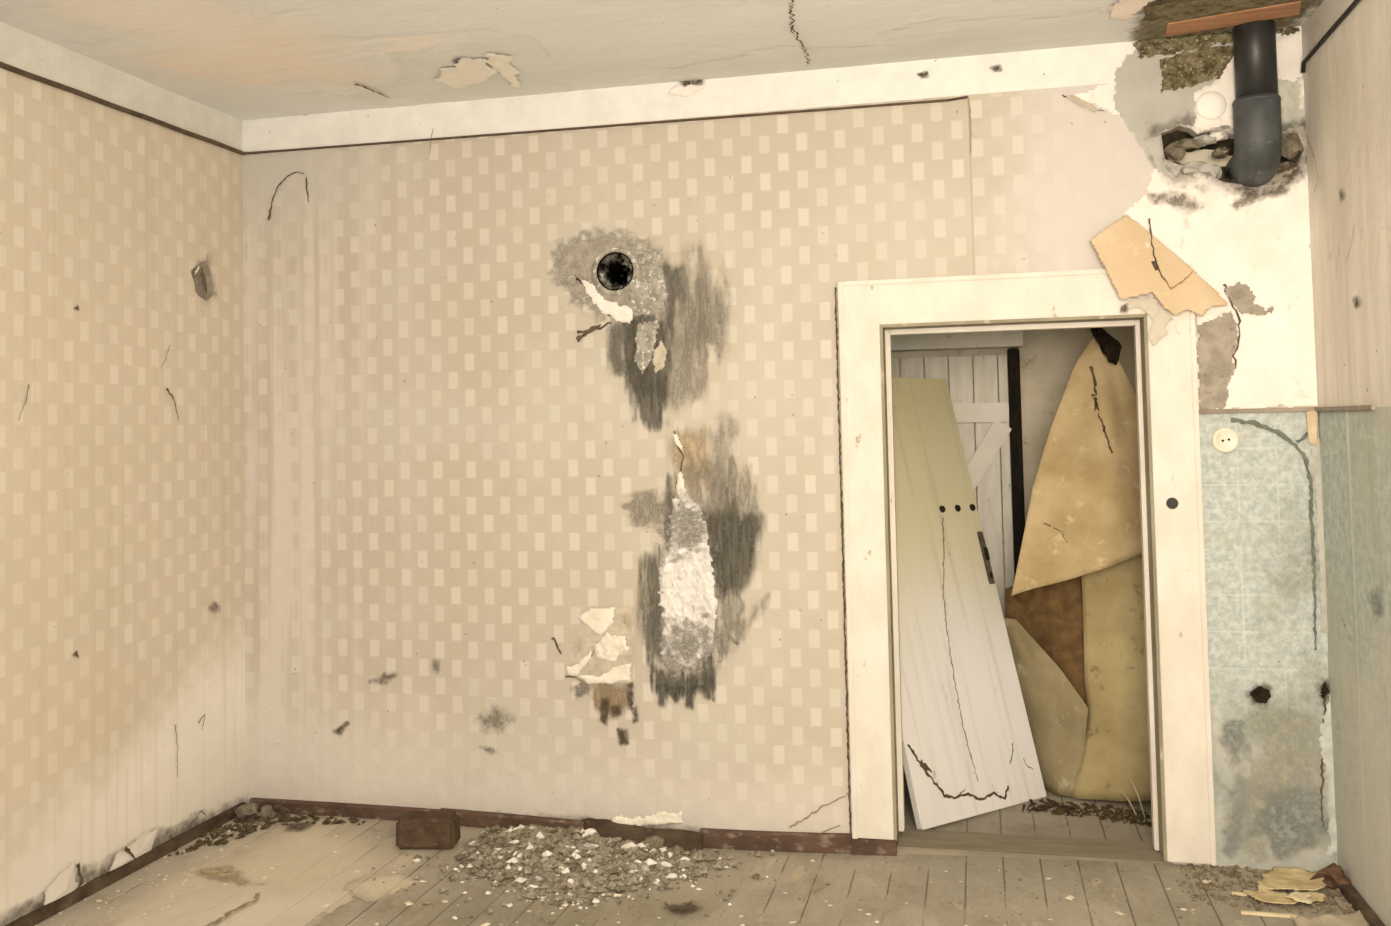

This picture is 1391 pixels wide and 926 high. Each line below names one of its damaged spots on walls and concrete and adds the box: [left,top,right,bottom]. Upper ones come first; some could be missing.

peeling [405,28,574,102]
crack [789,0,811,64]
peeling [1109,0,1152,20]
flaking render [1066,41,1307,192]
spalling [551,231,668,342]
peeling [653,340,667,373]
crack [1223,284,1241,369]
flaking render [1197,282,1274,410]
crack [1230,417,1317,650]
peeling [567,607,632,684]
leakage [0,616,169,863]
leakage [1203,582,1391,926]